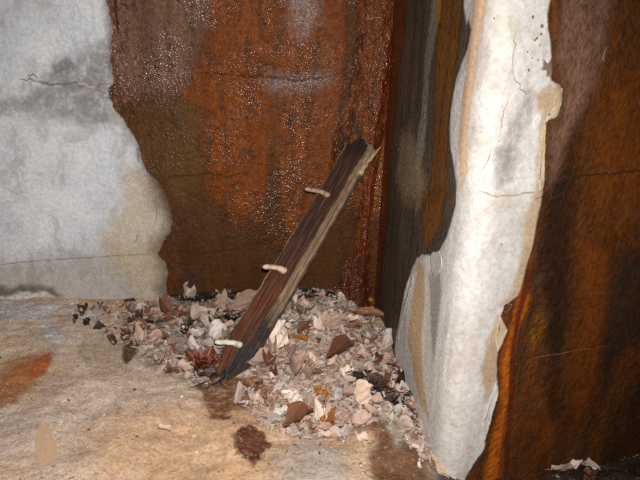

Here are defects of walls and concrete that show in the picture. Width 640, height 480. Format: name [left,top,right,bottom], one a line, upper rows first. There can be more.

spalling [527,51,552,77]
rust [106,0,360,296]
peeling [538,84,563,192]
rust [370,135,385,306]
rust [465,0,640,480]
crack [477,169,640,203]
peeling [397,272,414,345]
peeling [495,318,508,353]
rust [0,352,51,403]
peeling [482,381,499,440]